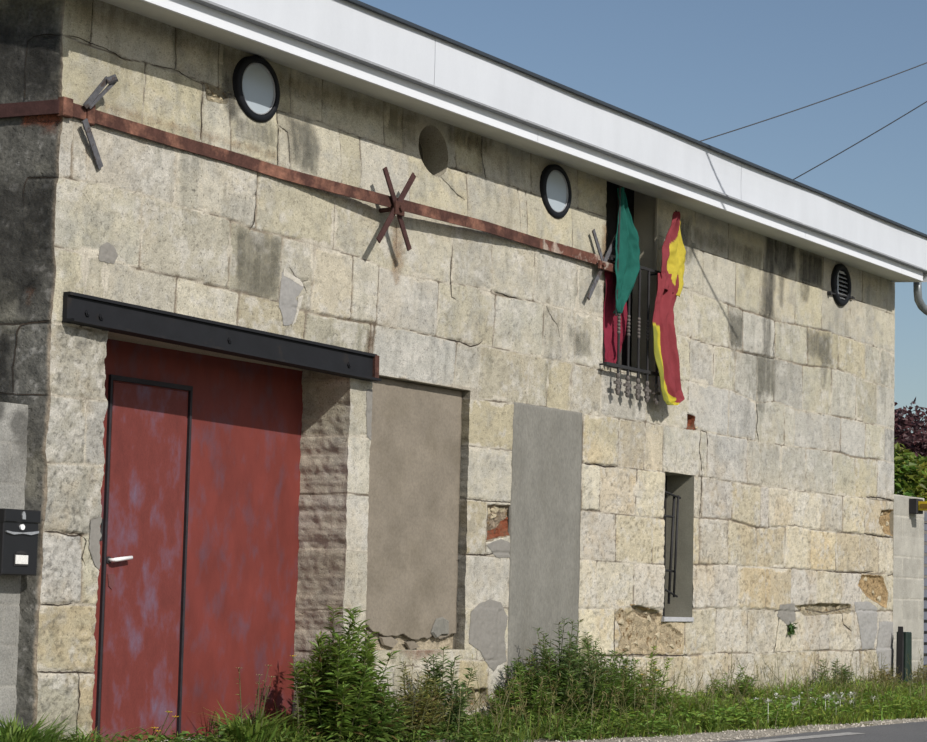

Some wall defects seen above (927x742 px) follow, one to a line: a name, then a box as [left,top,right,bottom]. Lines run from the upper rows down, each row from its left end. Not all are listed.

corrosion [24,114,61,124]
damp [764,237,822,315]
damp [807,333,829,359]
spalling [486,504,510,542]
spalling [879,509,893,536]
spalling [858,574,888,608]
spalling [795,603,851,616]
spalling [615,604,683,657]